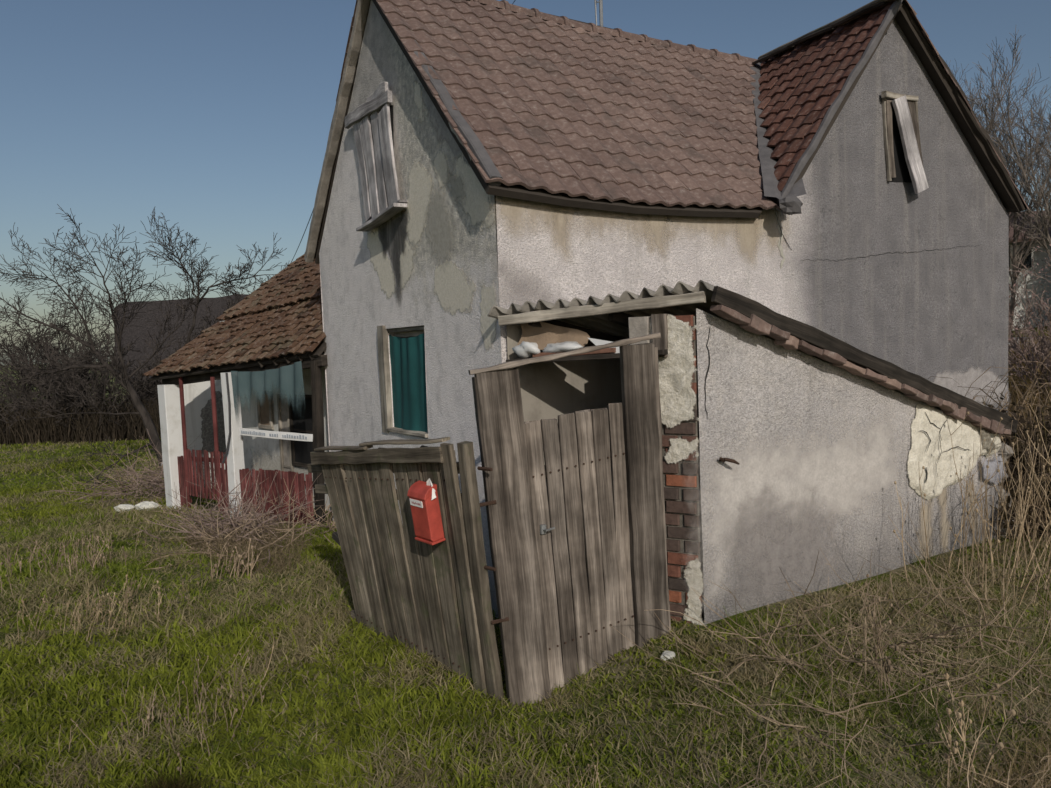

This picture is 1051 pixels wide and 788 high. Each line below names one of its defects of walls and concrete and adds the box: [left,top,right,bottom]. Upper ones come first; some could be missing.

leakage [378,210,408,300]
peeling [367,151,495,298]
crack [703,329,711,417]
peeling [200,391,226,454]
flaking render [658,314,707,626]